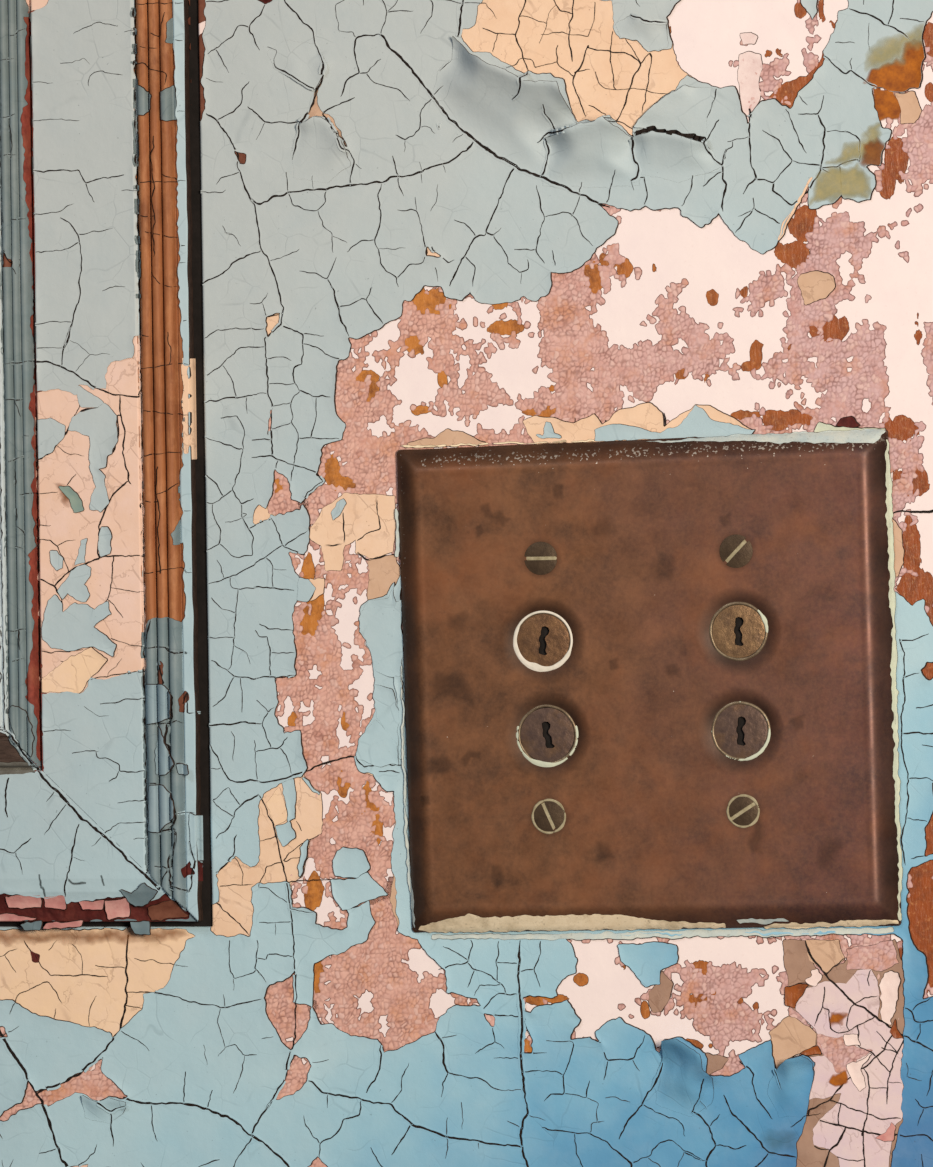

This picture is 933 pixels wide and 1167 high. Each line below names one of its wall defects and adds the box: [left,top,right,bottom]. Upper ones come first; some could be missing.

crack [483,0,862,233]
corrosion [862,141,884,165]
crack [823,0,924,89]
corrosion [867,40,924,120]
peeling [0,0,197,776]
crack [0,0,617,1167]
peeling [181,13,933,1167]
crack [893,508,933,516]
crack [898,633,933,865]
peeling [0,882,196,1037]
crack [303,939,933,1167]